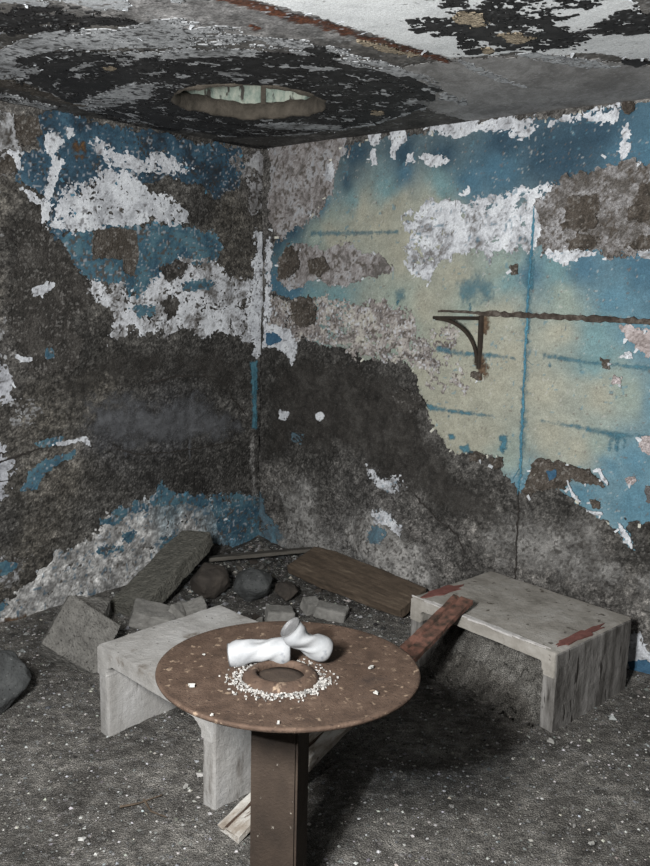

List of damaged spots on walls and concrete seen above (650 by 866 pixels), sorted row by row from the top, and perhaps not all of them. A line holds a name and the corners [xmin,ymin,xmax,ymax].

rust [217,0,451,63]
peeling [0,0,650,551]
leakage [85,360,259,511]
leakage [427,404,485,417]
rust [474,347,489,380]
peeling [0,480,287,622]
leakage [276,477,431,591]